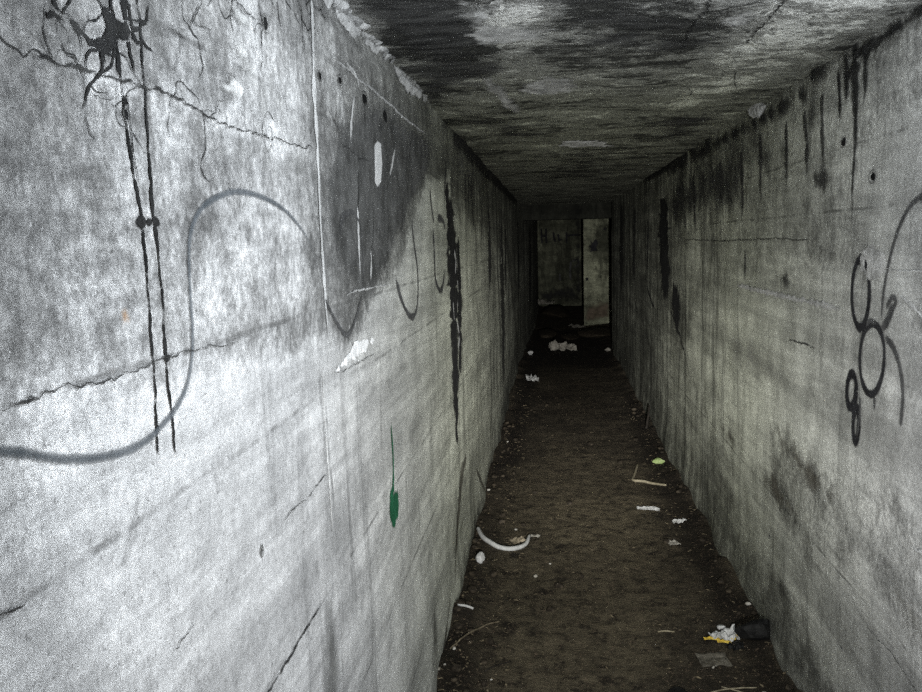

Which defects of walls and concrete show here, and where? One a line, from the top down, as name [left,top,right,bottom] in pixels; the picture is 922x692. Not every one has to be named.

crack [0,0,327,182]
damp [364,0,502,100]
crack [652,0,785,89]
damp [803,94,826,190]
damp [837,43,869,206]
damp [647,133,770,332]
crack [2,341,238,412]
crack [268,608,319,692]